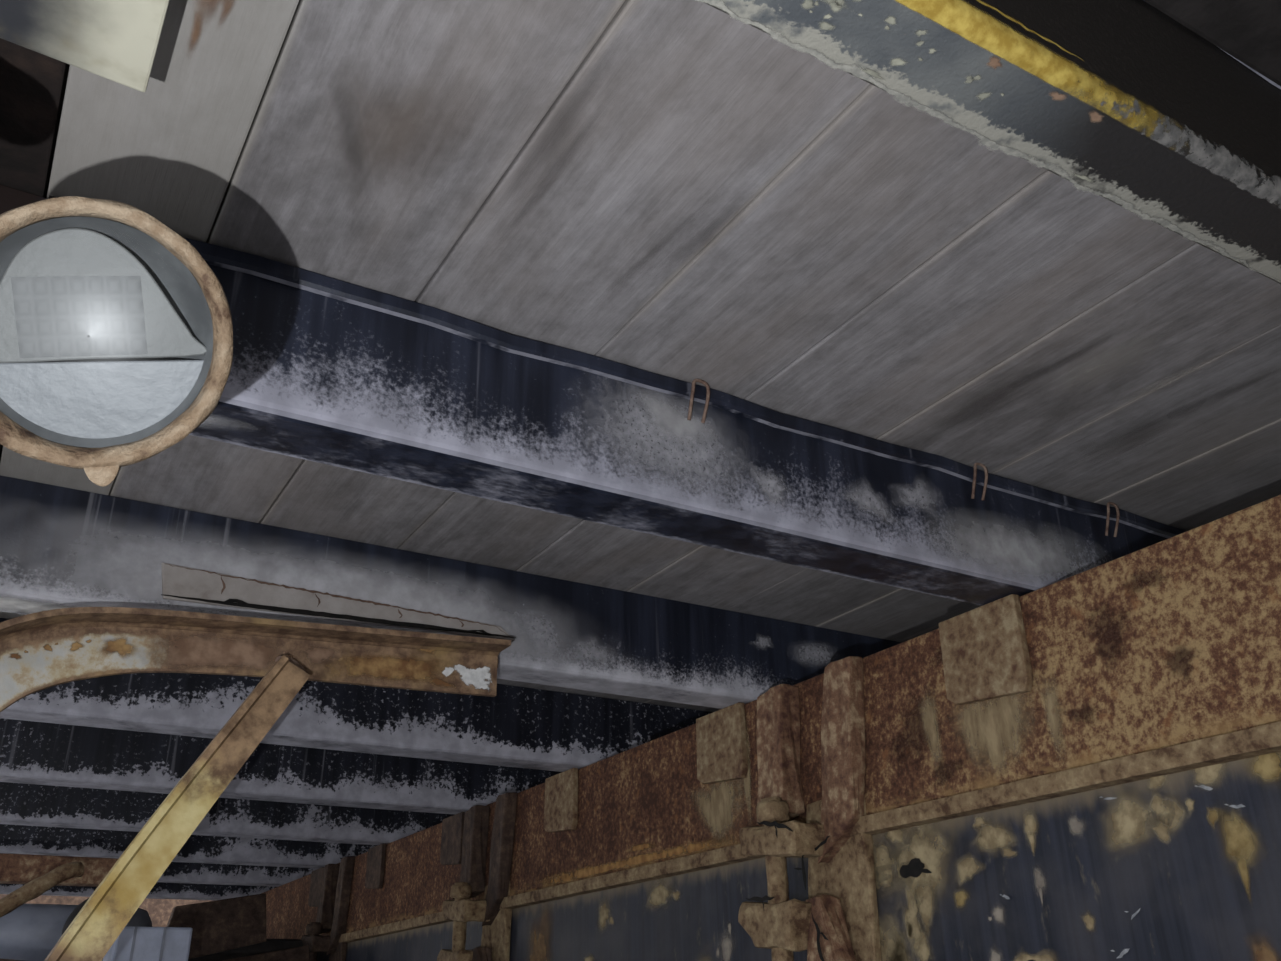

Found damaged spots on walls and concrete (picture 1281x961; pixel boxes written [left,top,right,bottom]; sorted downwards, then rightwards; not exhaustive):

leakage [977,0,1082,60]
peeling [695,0,1281,282]
rust [44,638,133,656]
peeling [442,664,491,690]
rust [959,695,1021,766]
rust [1194,764,1223,784]
rust [1252,752,1281,780]
rust [548,732,750,885]
rust [1110,775,1256,895]
hole [899,858,932,878]
rust [873,814,1037,961]
rust [991,951,1055,961]